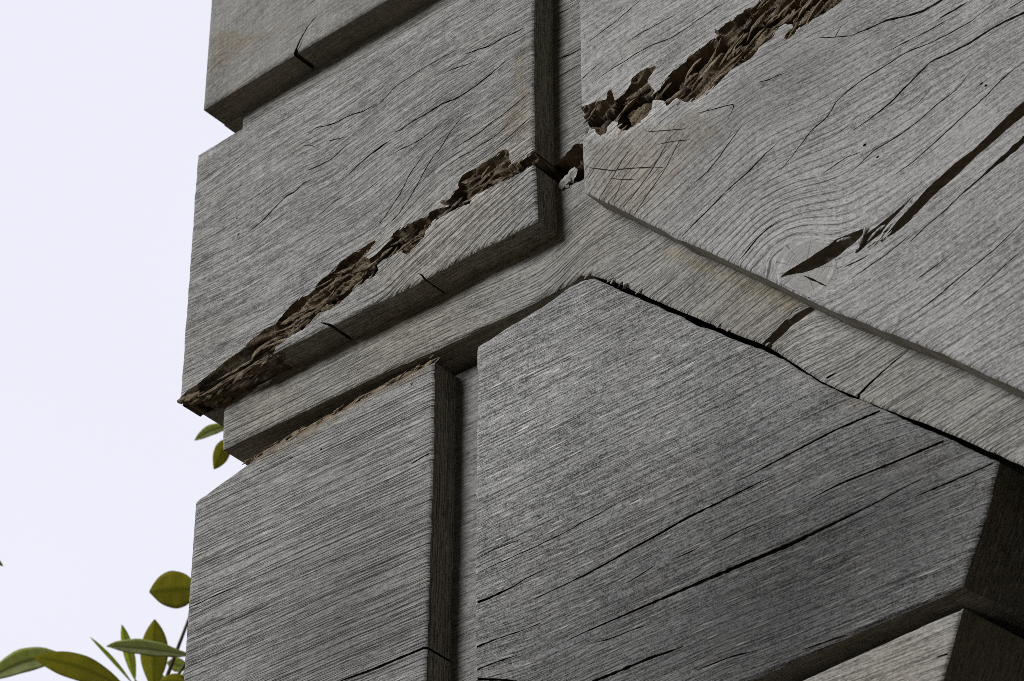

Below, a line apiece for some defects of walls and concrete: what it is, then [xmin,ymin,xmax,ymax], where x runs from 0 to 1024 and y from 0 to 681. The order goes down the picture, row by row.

peeling [177,221,424,409]
peeling [430,148,537,225]
peeling [558,167,578,190]
peeling [607,0,824,135]
crack [682,0,1024,236]
crack [762,102,1024,351]
crack [477,351,908,681]
crack [570,440,993,643]